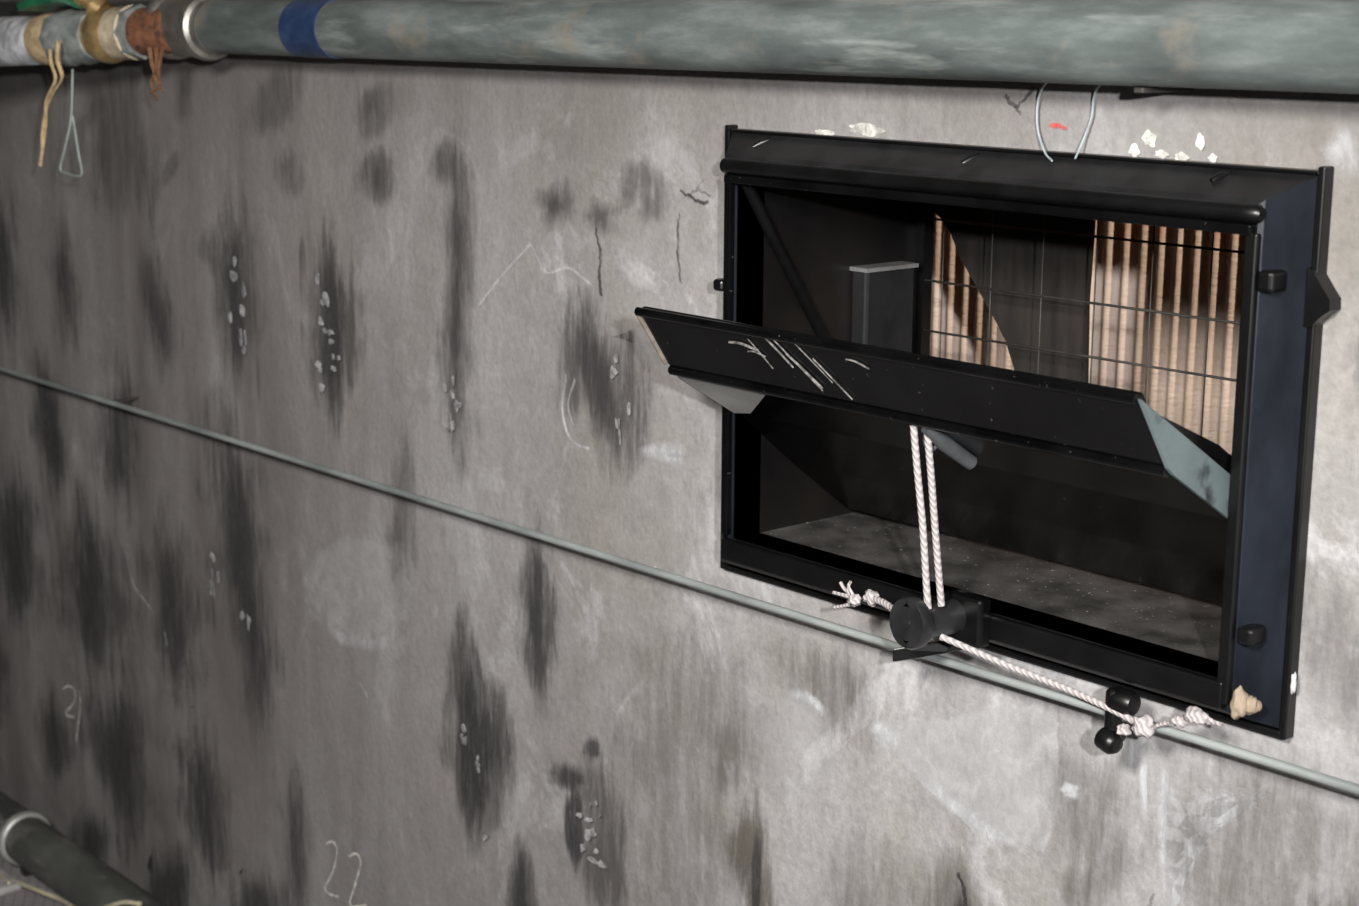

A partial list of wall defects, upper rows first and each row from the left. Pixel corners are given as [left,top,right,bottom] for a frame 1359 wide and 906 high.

leakage [211,225,256,368]
leakage [313,228,356,428]
leakage [594,206,606,296]
leakage [565,309,647,458]
leakage [60,484,130,664]
leakage [155,432,271,706]
leakage [450,615,511,841]
leakage [179,742,226,880]
leakage [553,766,623,905]